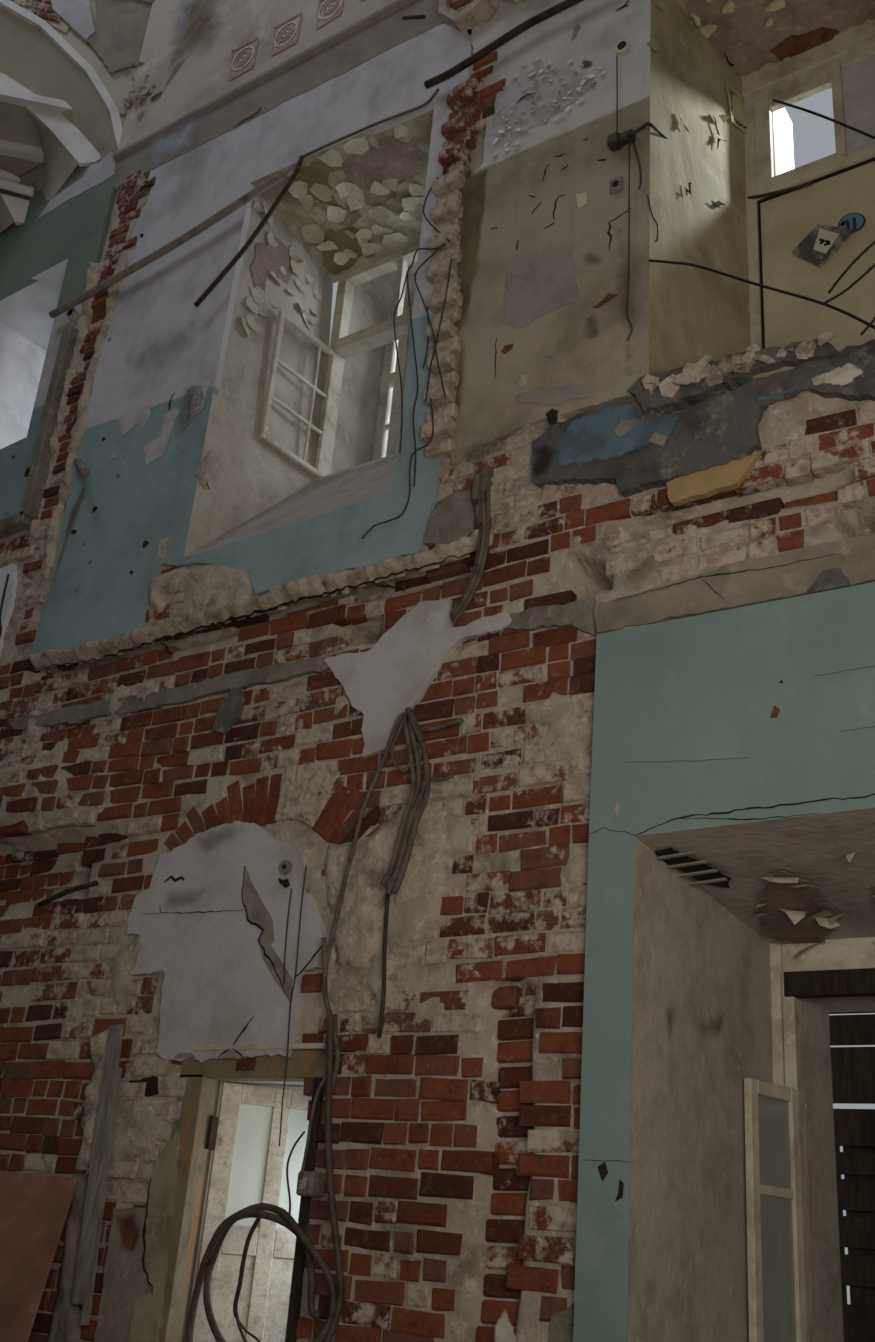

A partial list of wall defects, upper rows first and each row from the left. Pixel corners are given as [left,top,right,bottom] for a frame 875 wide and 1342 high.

flaking render [11,0,69,34]
flaking render [86,0,161,122]
flaking render [438,0,530,32]
peeling [686,0,875,142]
spalling [242,51,605,460]
flaking render [0,170,156,645]
peeling [117,379,210,466]
flaking render [807,568,851,593]
crack [633,755,748,763]
crack [589,793,875,836]
flaking render [242,866,322,1001]
flaking render [108,1052,196,1207]